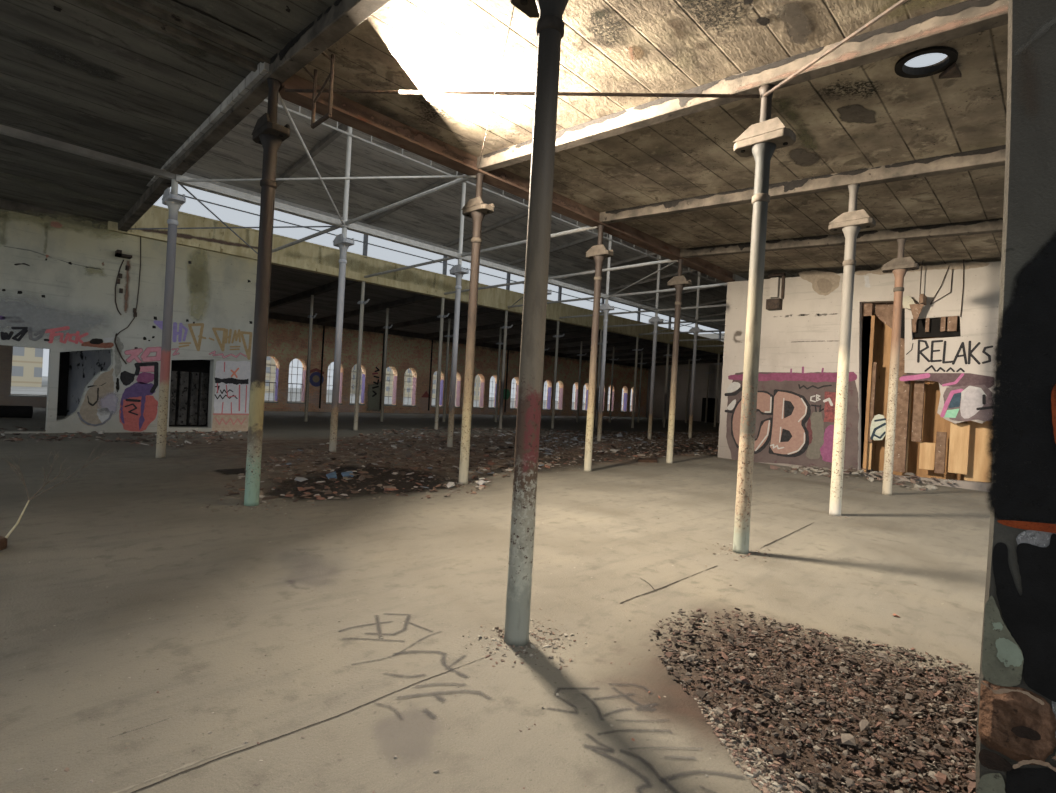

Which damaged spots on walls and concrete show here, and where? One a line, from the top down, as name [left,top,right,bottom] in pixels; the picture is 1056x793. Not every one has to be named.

damp [588,8,626,45]
damp [680,0,746,32]
damp [818,81,878,123]